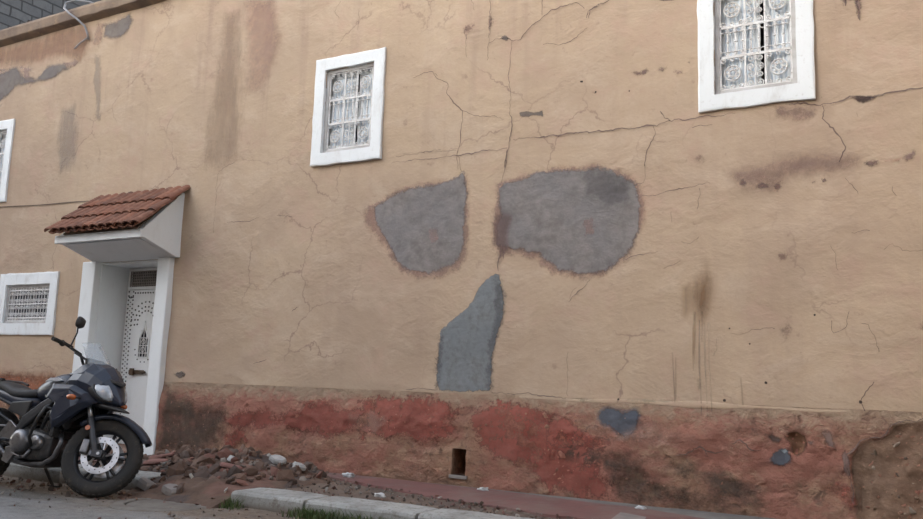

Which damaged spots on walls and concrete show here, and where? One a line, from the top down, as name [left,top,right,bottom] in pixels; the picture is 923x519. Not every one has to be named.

flaking render [0,59,77,100]
flaking render [104,15,132,38]
crack [465,0,609,88]
crack [396,71,726,208]
crack [789,87,923,192]
water stain [160,394,222,451]
spalling [827,421,923,519]